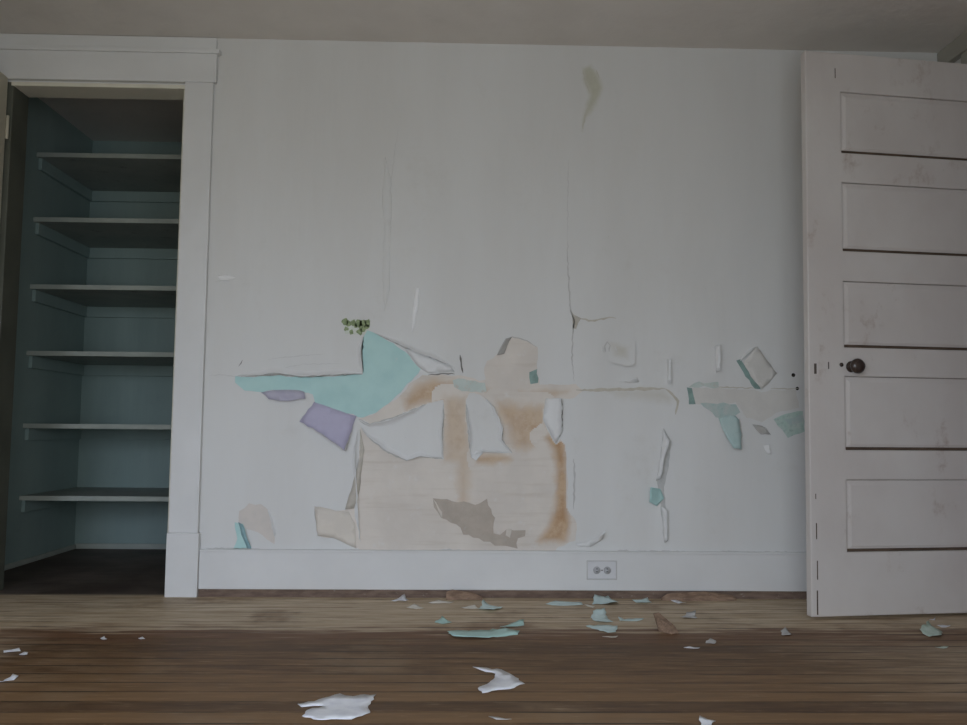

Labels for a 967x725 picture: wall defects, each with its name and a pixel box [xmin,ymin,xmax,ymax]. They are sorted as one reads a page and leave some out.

crack [567,161,616,379]
flaking render [233,330,606,550]
damp [393,375,578,551]
peeling [649,428,671,543]
peeling [687,347,805,454]